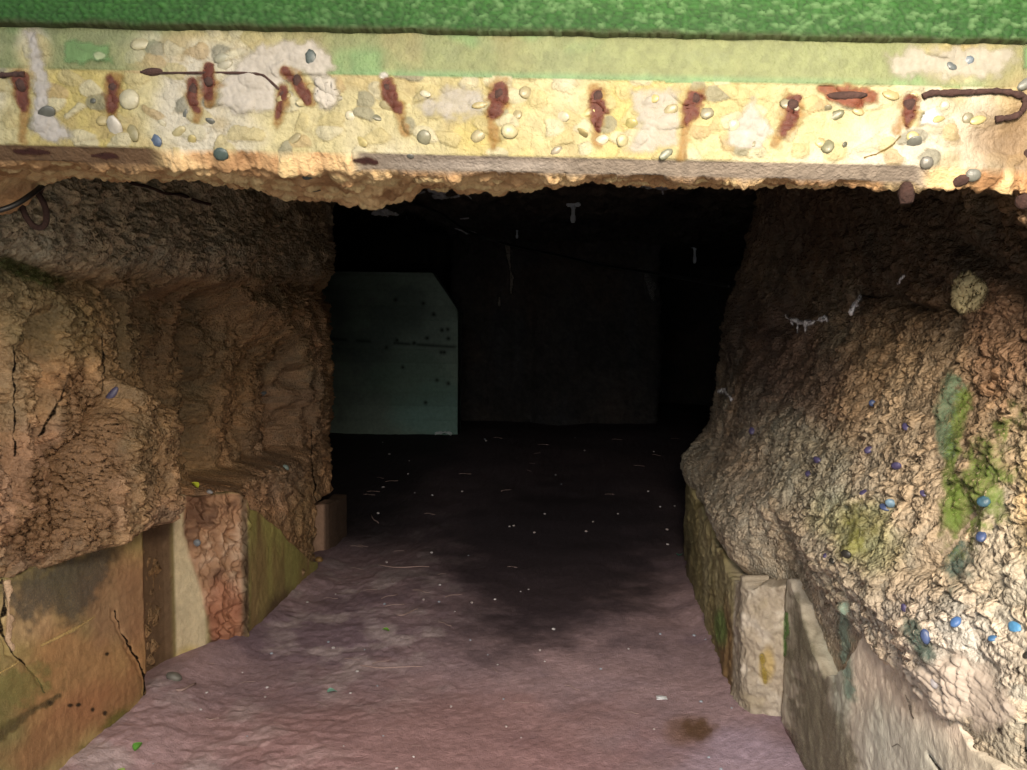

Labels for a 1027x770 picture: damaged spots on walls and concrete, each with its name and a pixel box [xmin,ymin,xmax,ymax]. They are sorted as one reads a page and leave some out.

corrosion [185,62,219,123]
corrosion [274,66,315,126]
corrosion [381,77,409,136]
corrosion [486,81,510,149]
corrosion [589,84,610,147]
corrosion [677,90,705,161]
corrosion [771,94,804,147]
corrosion [817,83,878,109]
water stain [943,388,969,577]
crack [0,579,45,693]
crack [114,610,146,696]
water stain [903,619,935,663]